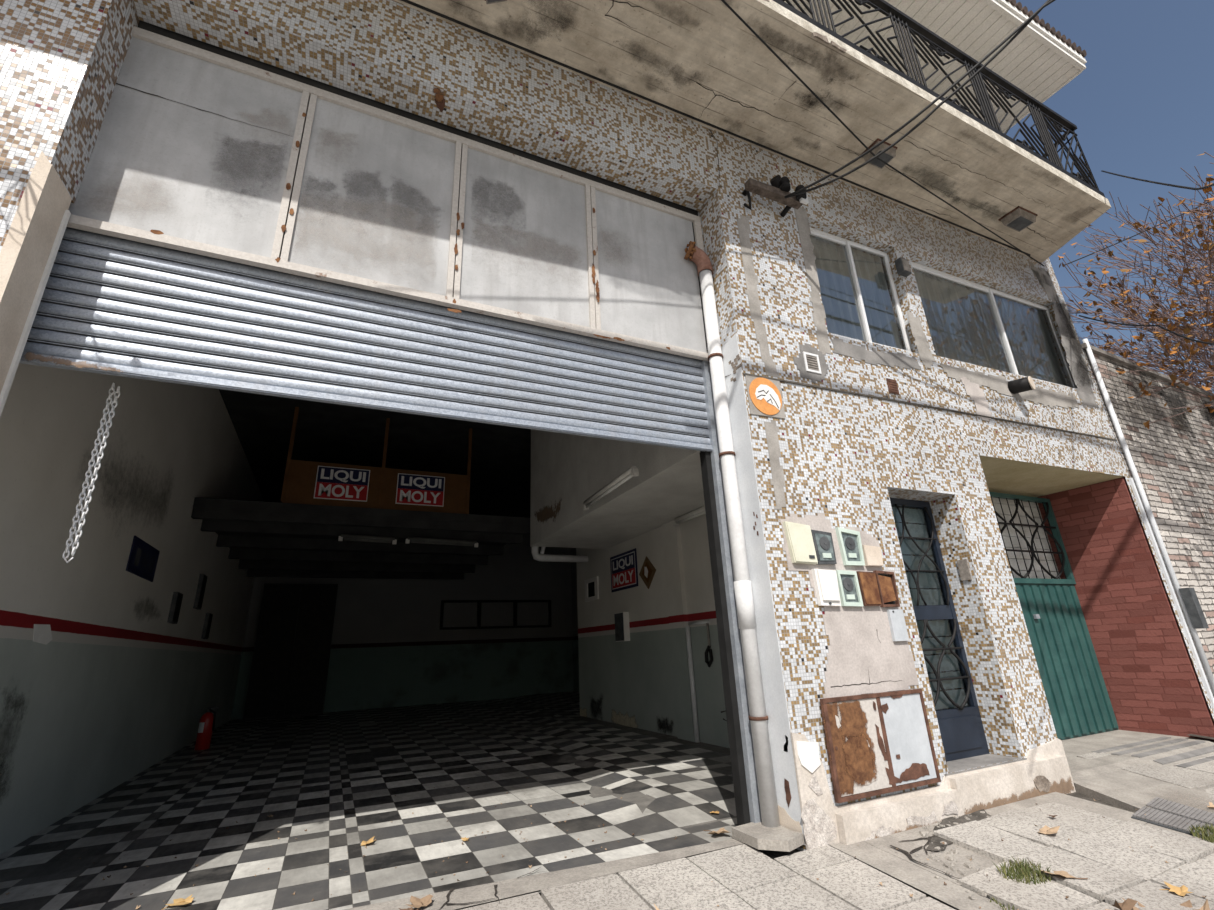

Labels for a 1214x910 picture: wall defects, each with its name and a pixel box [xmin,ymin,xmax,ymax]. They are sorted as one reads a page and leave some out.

crack [605,0,658,29]
crack [116,83,293,137]
rust [454,212,464,270]
rust [592,250,600,302]
rust [822,695,930,795]